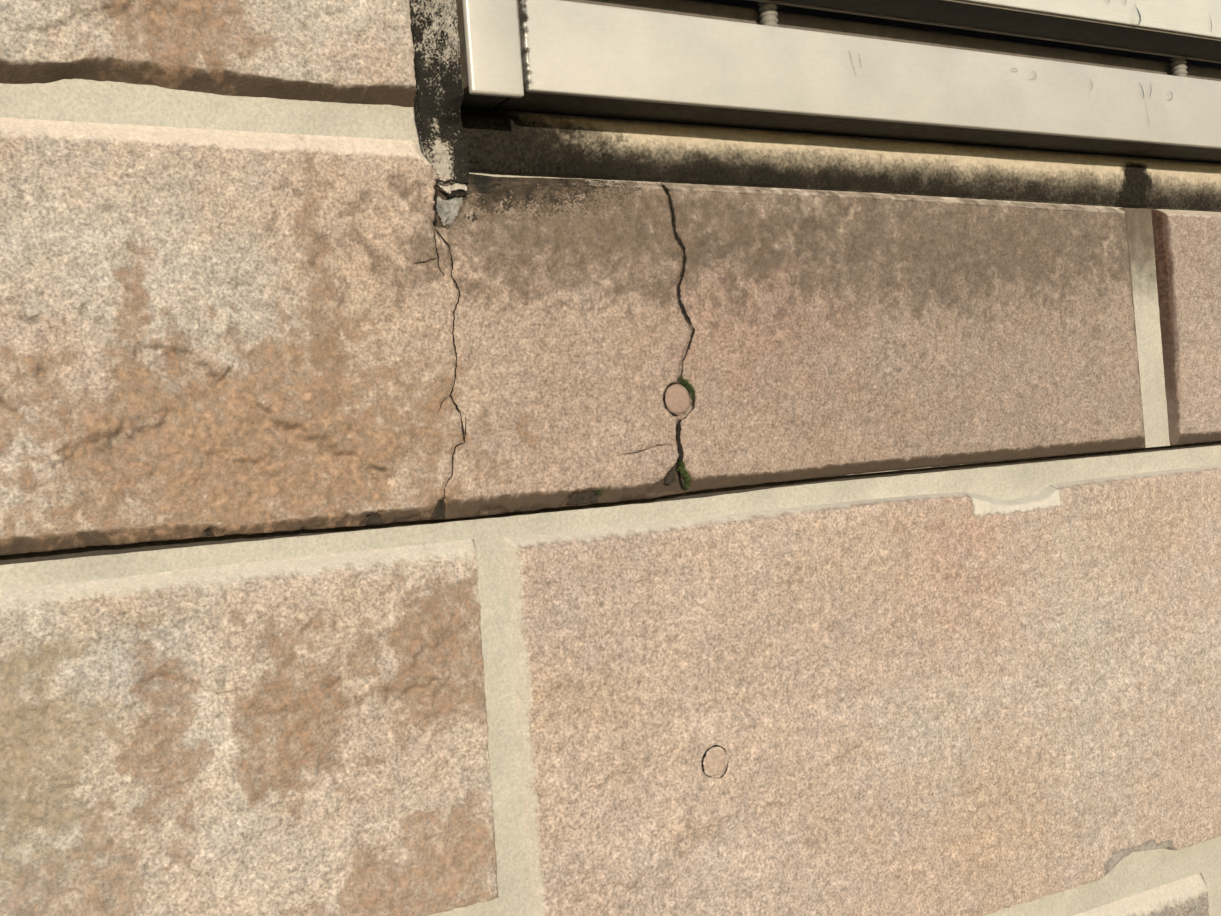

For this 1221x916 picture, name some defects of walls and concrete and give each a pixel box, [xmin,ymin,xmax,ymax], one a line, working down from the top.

water stain [409,0,1221,296]
crack [413,226,467,502]
crack [616,183,695,462]